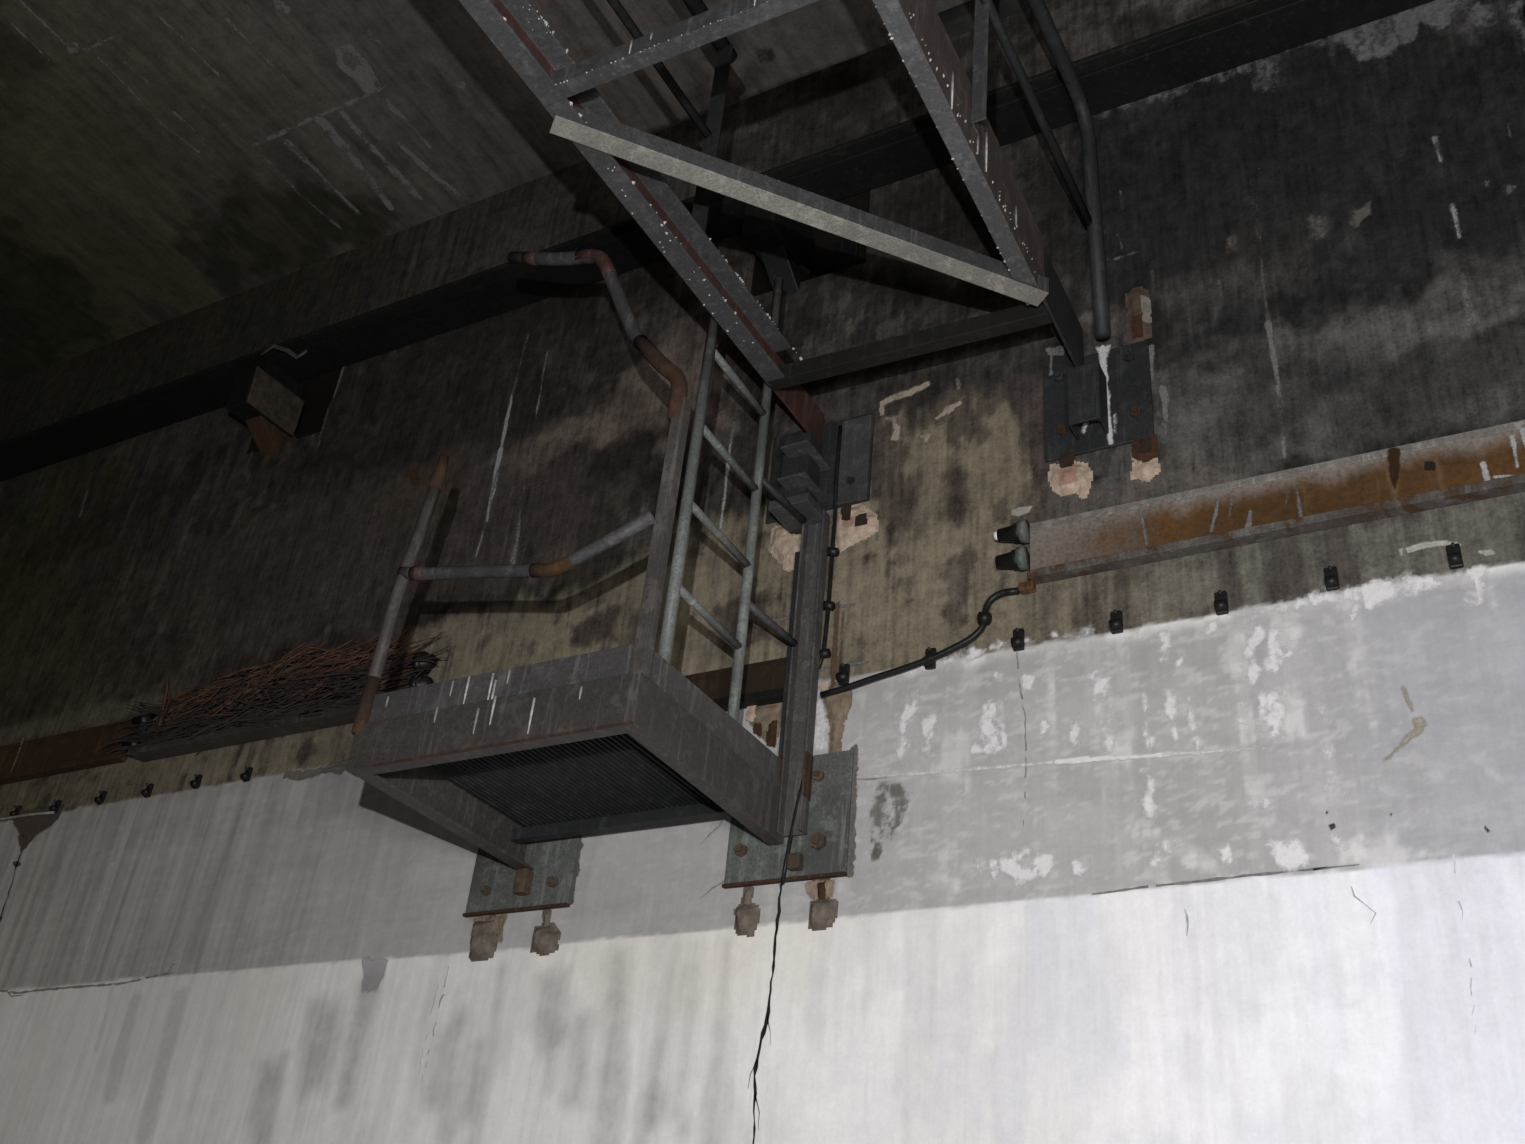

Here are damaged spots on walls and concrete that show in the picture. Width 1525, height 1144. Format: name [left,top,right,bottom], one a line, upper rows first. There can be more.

damp [1264,306,1282,398]
spalling [1048,452,1093,499]
spalling [1130,434,1161,482]
rust [1388,448,1400,488]
spalling [768,525,802,572]
spalling [832,503,879,553]
peeling [1236,627,1295,744]
peeling [970,674,1035,755]
peeling [1266,838,1311,871]
crack [0,848,22,921]
crack [0,963,177,997]
crack [748,884,782,1144]